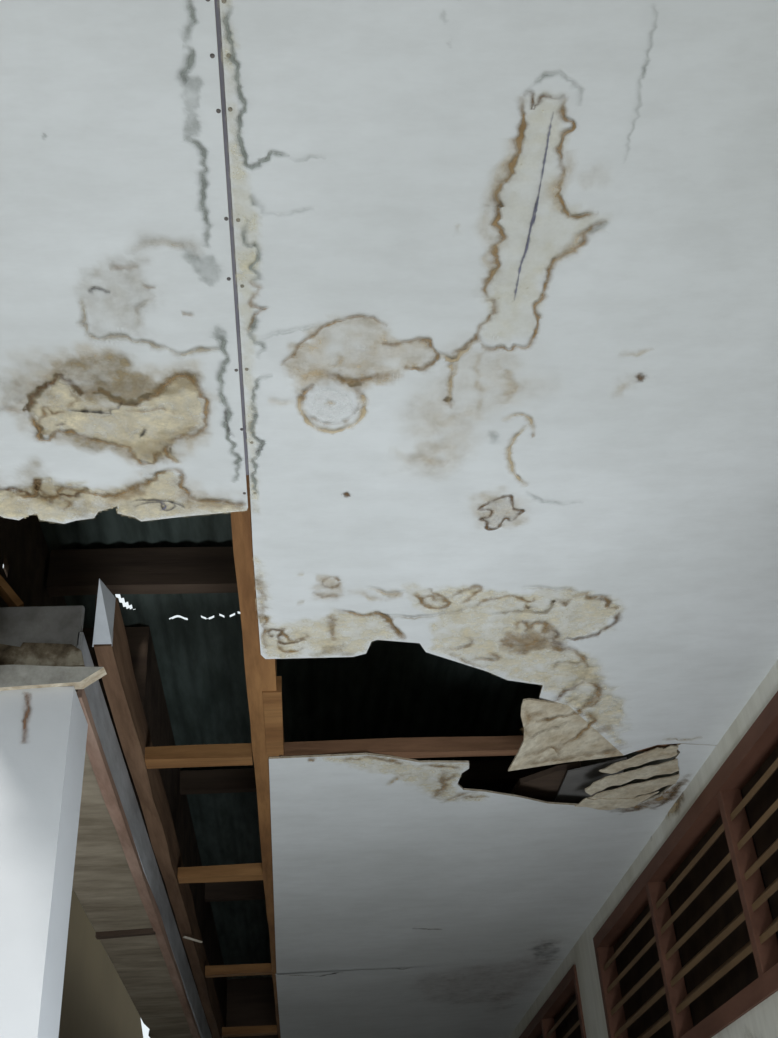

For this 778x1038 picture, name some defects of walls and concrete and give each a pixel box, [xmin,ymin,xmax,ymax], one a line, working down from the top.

damp [180,51,195,81]
damp [224,16,282,169]
damp [192,141,209,237]
damp [483,95,551,293]
damp [490,106,597,351]
damp [82,309,160,349]
damp [389,309,496,387]
damp [0,339,265,521]
damp [298,373,366,434]
damp [507,414,533,481]
damp [479,495,524,530]